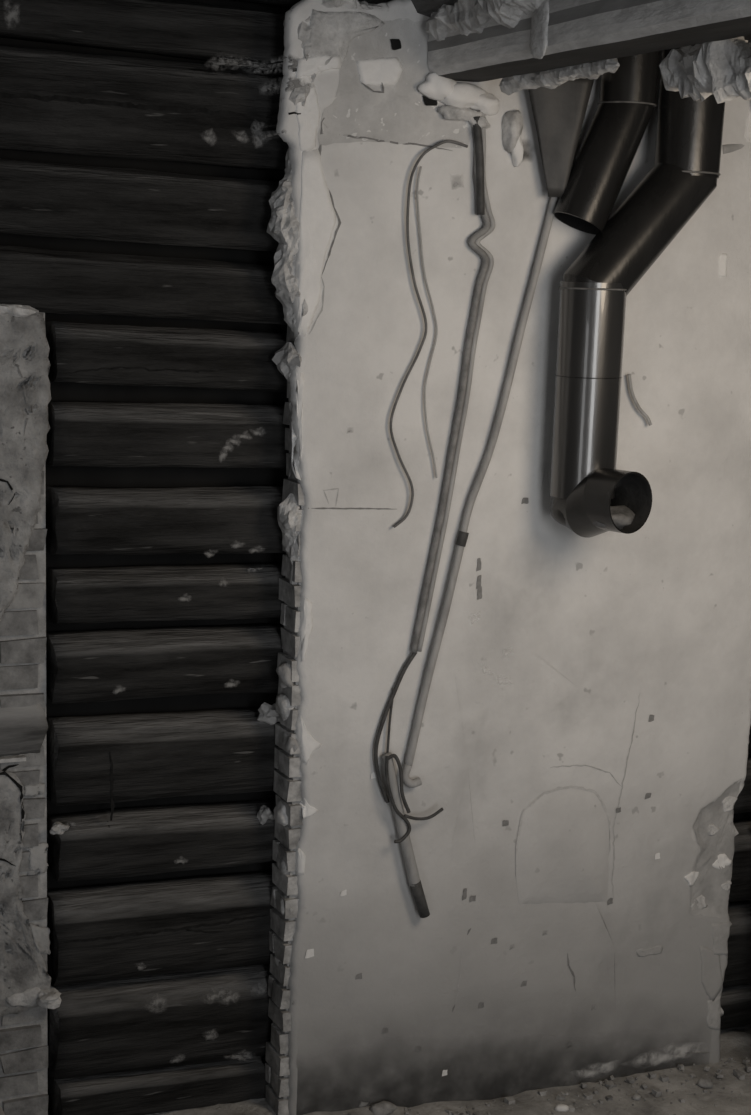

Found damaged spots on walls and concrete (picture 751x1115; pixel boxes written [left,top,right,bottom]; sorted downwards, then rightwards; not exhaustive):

peeling [267,0,474,480]
spalling [0,304,39,317]
spalling [277,493,301,585]
peeling [275,598,323,764]
spalling [24,782,45,797]
crack [0,764,25,866]
spalling [274,800,288,826]
peeling [299,798,319,819]
spalling [27,842,49,875]
spalling [684,779,742,1030]
spalling [30,923,51,955]
spalling [6,987,40,1007]